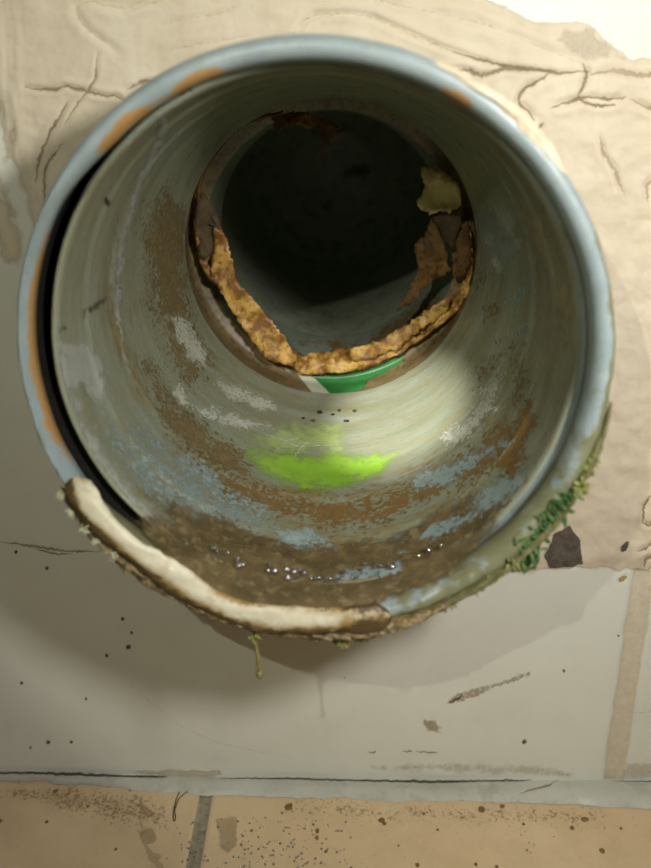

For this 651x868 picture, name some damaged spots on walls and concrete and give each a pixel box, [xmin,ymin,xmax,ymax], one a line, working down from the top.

crack [391,25,651,128]
crack [28,54,150,205]
crack [600,135,651,202]
rust [299,289,443,350]
rust [188,399,543,537]
crack [2,542,94,555]